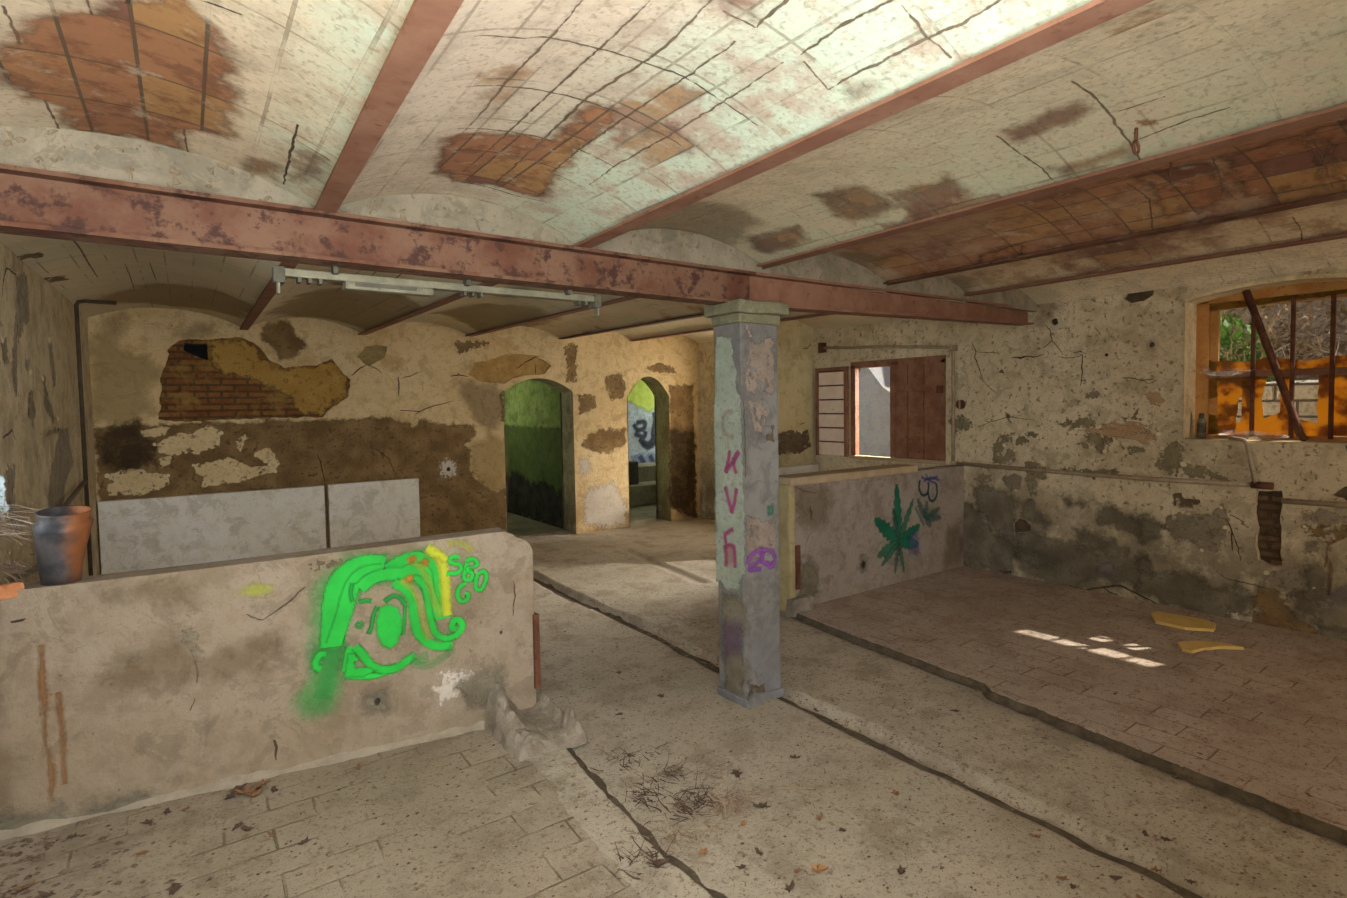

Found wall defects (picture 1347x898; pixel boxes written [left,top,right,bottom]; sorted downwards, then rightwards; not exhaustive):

peeling [0,0,240,150]
peeling [433,105,613,197]
crack [452,0,1001,203]
spalling [104,337,351,497]
peeling [0,463,17,524]
leakage [94,417,563,548]
leakage [578,427,628,528]
leakage [1063,466,1120,480]
leakage [963,484,1255,622]
spalling [1254,490,1283,567]
leakage [1290,563,1347,641]
peeling [1302,486,1347,556]